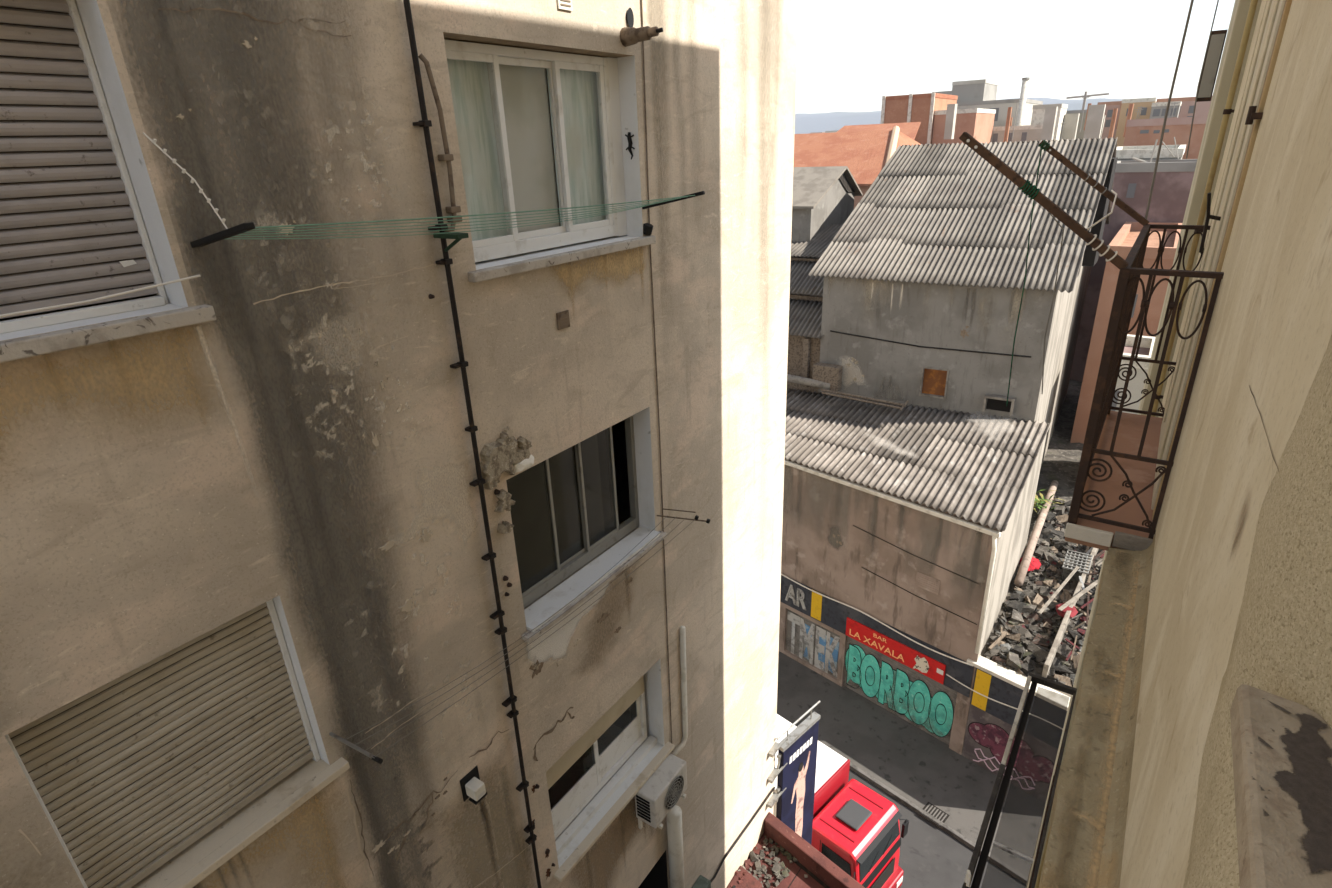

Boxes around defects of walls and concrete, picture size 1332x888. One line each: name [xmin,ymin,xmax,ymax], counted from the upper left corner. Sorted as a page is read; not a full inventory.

water stain [119,0,420,888]
peeling [288,316,354,445]
crack [344,707,575,888]
peeling [1250,698,1332,873]